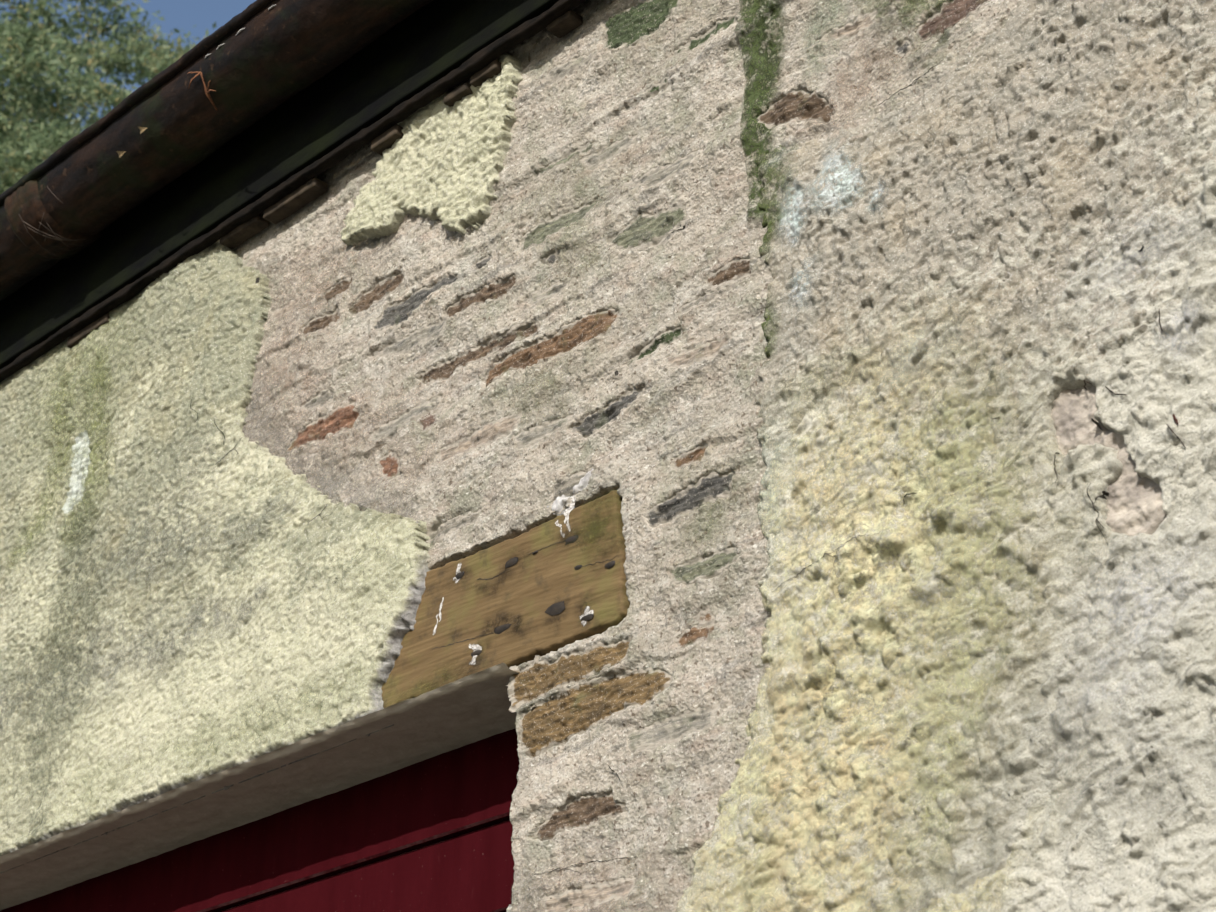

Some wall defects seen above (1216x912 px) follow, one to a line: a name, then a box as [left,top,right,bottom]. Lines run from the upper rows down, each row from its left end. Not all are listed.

leakage [740,0,785,249]
spalling [235,0,1021,912]
spalling [1051,385,1167,536]